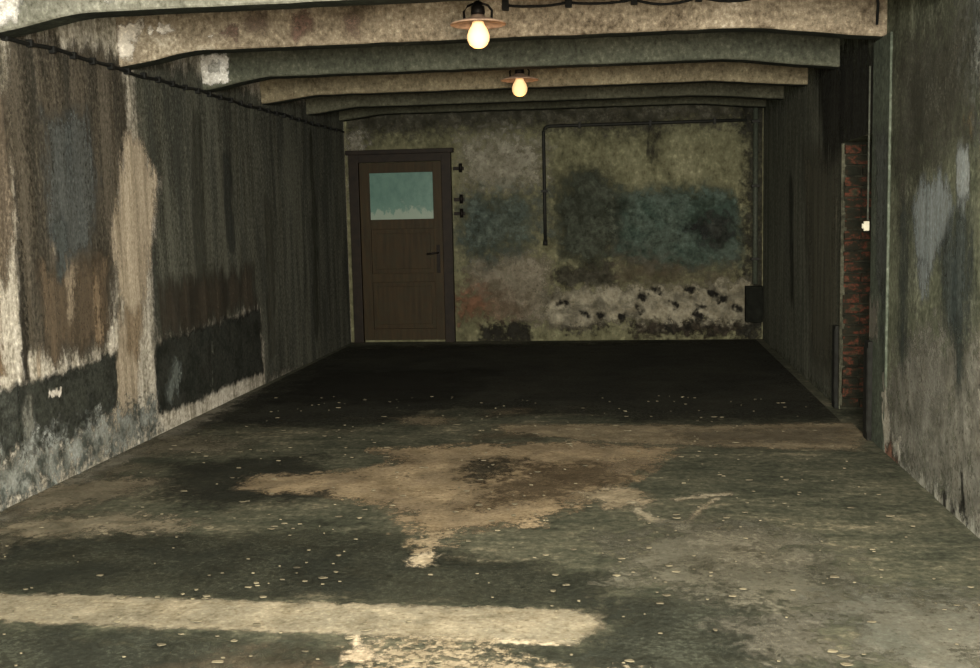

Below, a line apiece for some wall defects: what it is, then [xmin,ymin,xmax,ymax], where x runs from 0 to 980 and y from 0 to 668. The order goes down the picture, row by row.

peeling [345,130,371,157]
peeling [454,125,551,197]
water stain [0,29,841,512]
flaking render [461,247,751,336]
water stain [875,128,980,531]
water stain [0,531,805,668]